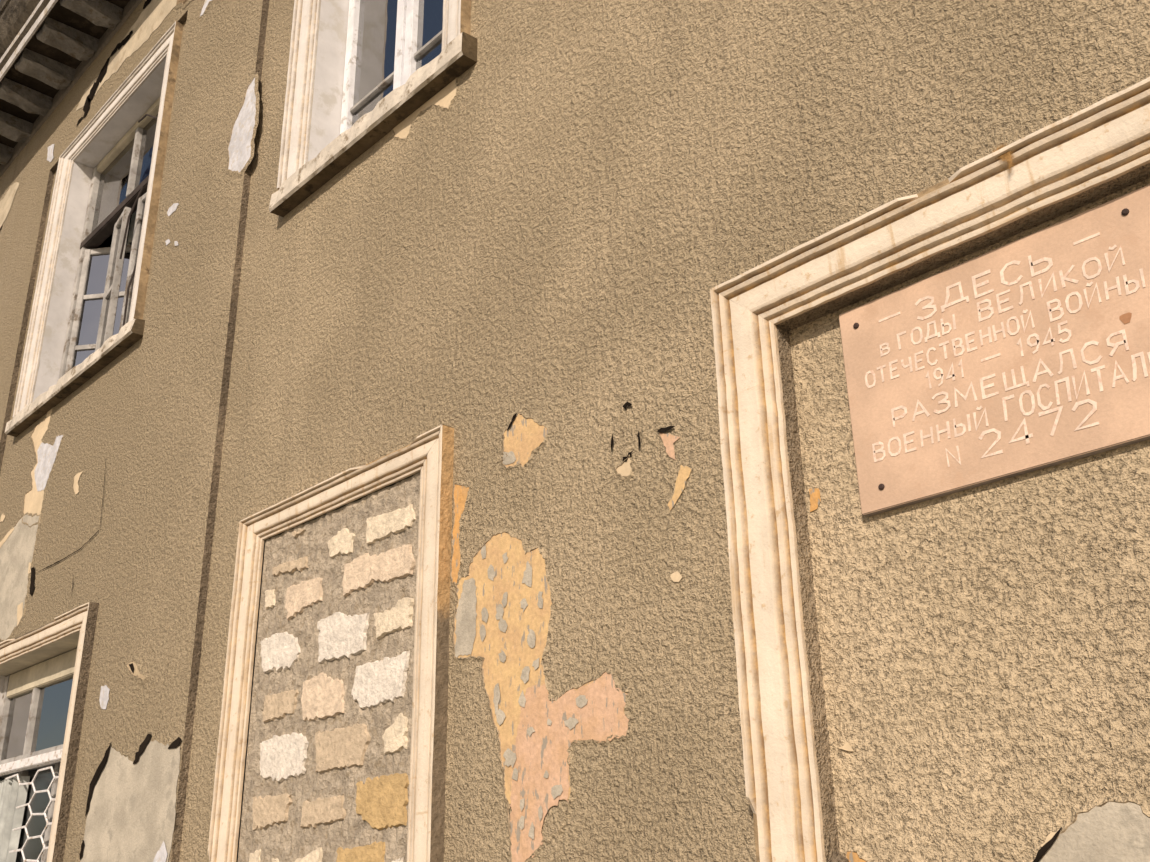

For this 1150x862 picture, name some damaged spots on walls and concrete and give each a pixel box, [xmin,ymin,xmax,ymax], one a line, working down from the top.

peeling [226,72,260,178]
peeling [391,77,460,142]
peeling [22,407,66,528]
peeling [500,409,552,472]
peeling [614,450,636,481]
peeling [659,432,691,510]
peeling [450,481,634,862]
peeling [153,841,168,862]